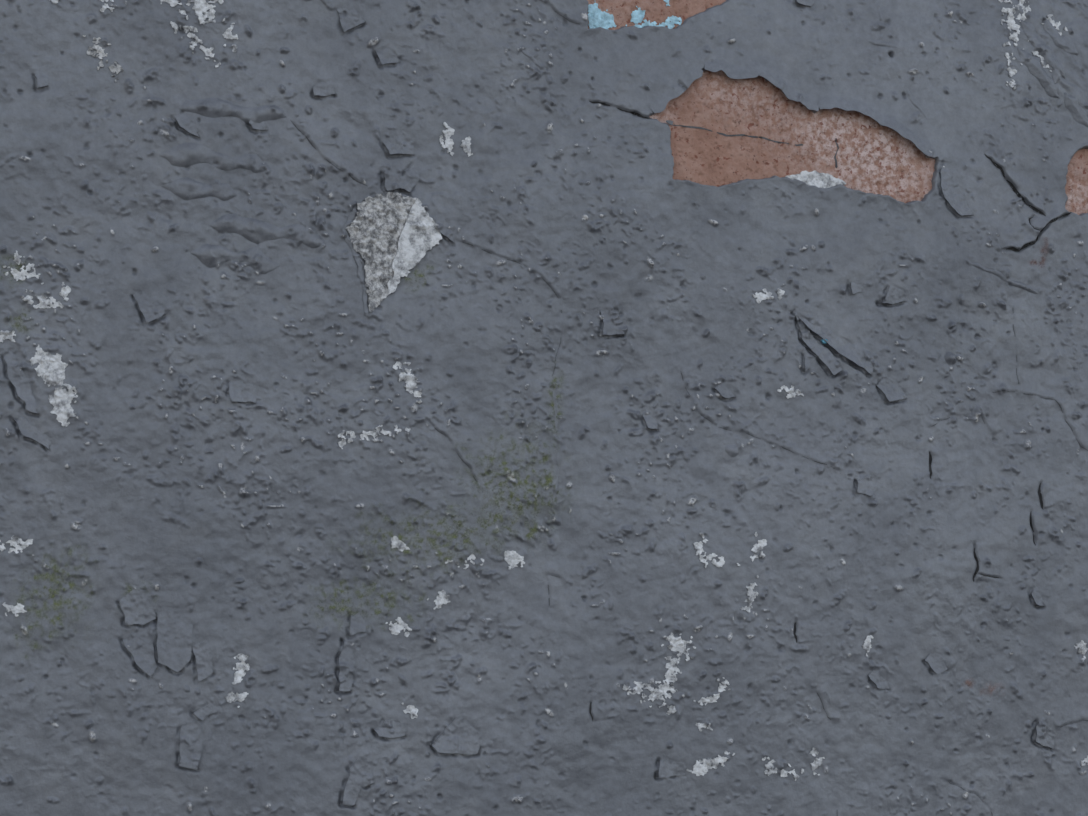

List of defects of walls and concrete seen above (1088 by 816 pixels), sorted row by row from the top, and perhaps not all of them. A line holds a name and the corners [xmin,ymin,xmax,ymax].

peeling [587,0,726,30]
flaking render [342,140,454,316]
peeling [648,57,973,216]
crack [985,154,1072,252]
peeling [1065,149,1088,215]